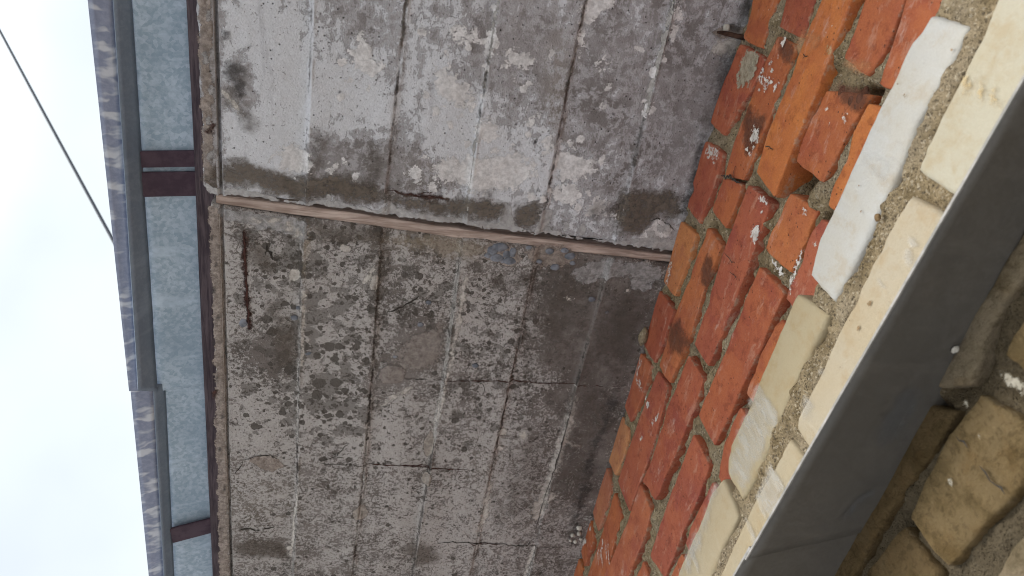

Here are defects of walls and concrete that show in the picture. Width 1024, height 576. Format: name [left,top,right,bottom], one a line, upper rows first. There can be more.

leakage [744,108,764,155]
leakage [205,159,545,228]
crack [386,190,448,200]
leakage [613,143,719,235]
corrosion [239,226,253,329]
crack [415,379,626,394]
crack [323,445,470,471]
leakage [533,396,616,533]